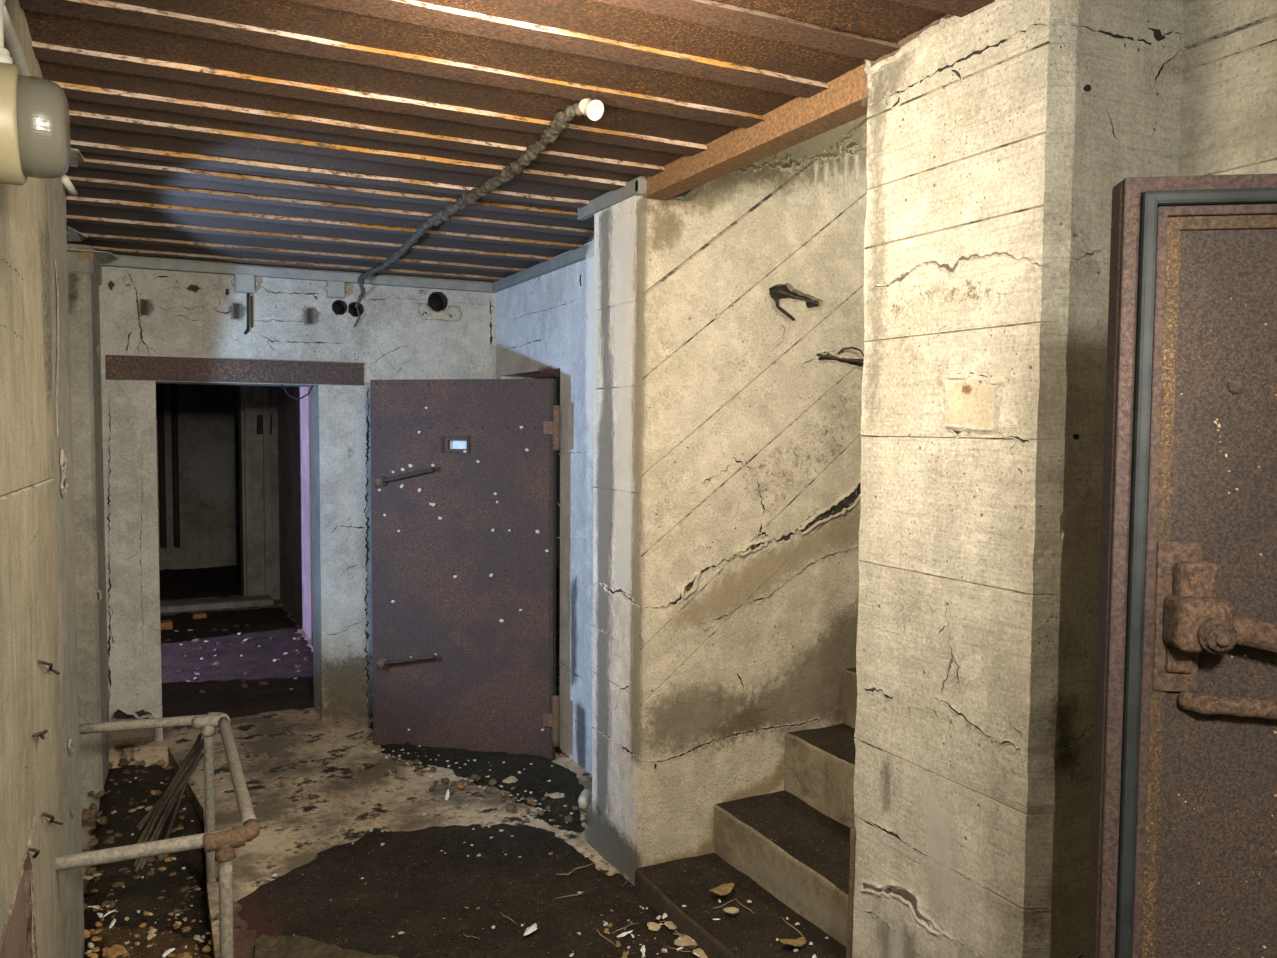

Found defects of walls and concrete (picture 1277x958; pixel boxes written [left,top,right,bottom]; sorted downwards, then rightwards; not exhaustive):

crack [869,1,1182,110]
water stain [630,116,867,760]
water stain [576,208,640,886]
crack [559,456,861,679]
crack [566,684,838,770]
crack [736,672,745,691]
crack [863,683,894,702]
crack [934,586,1024,752]
spalling [0,846,37,958]